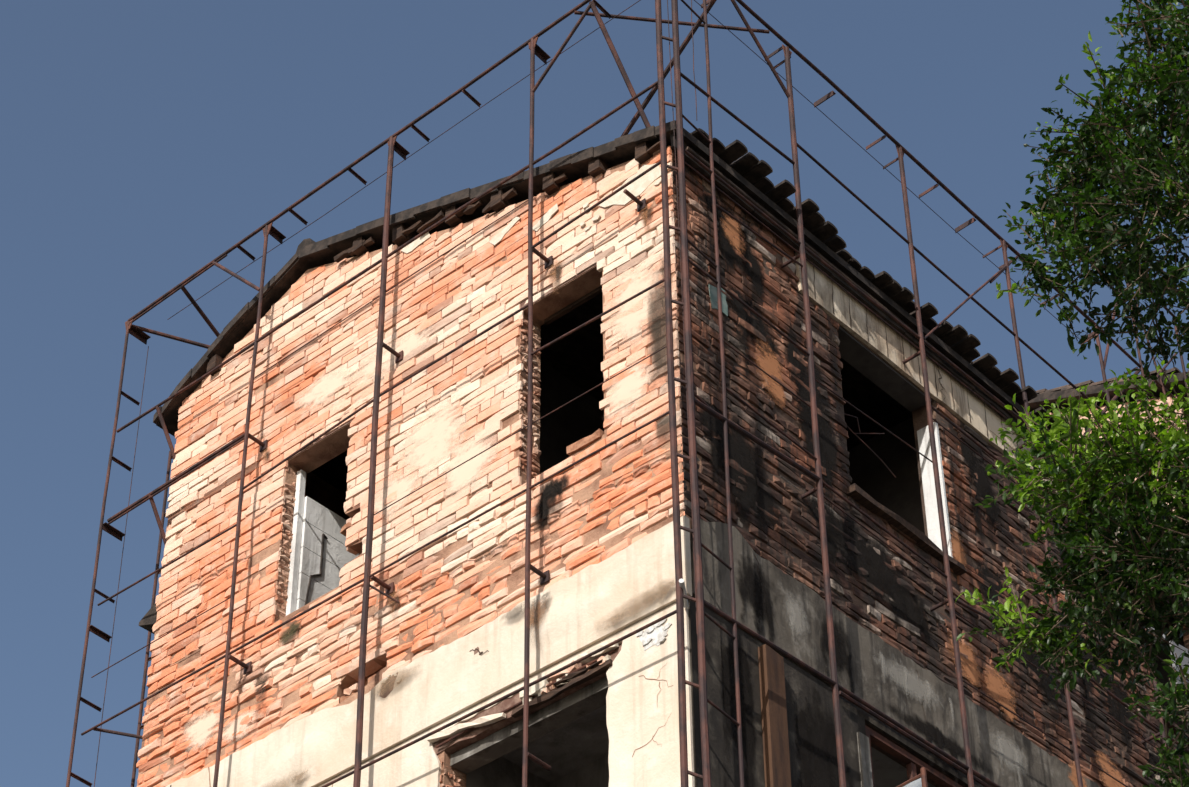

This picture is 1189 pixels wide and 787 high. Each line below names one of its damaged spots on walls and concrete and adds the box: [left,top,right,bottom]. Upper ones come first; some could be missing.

water stain [699,193,930,642]
water stain [534,475,568,526]
water stain [960,440,1001,547]
spalling [427,639,622,787]
crack [632,663,673,757]
peeling [636,618,672,651]
water stain [722,645,755,787]
water stain [796,689,853,787]
water stain [821,619,853,689]
water stain [889,705,989,784]
water stain [975,562,1065,732]
water stain [1057,603,1139,746]